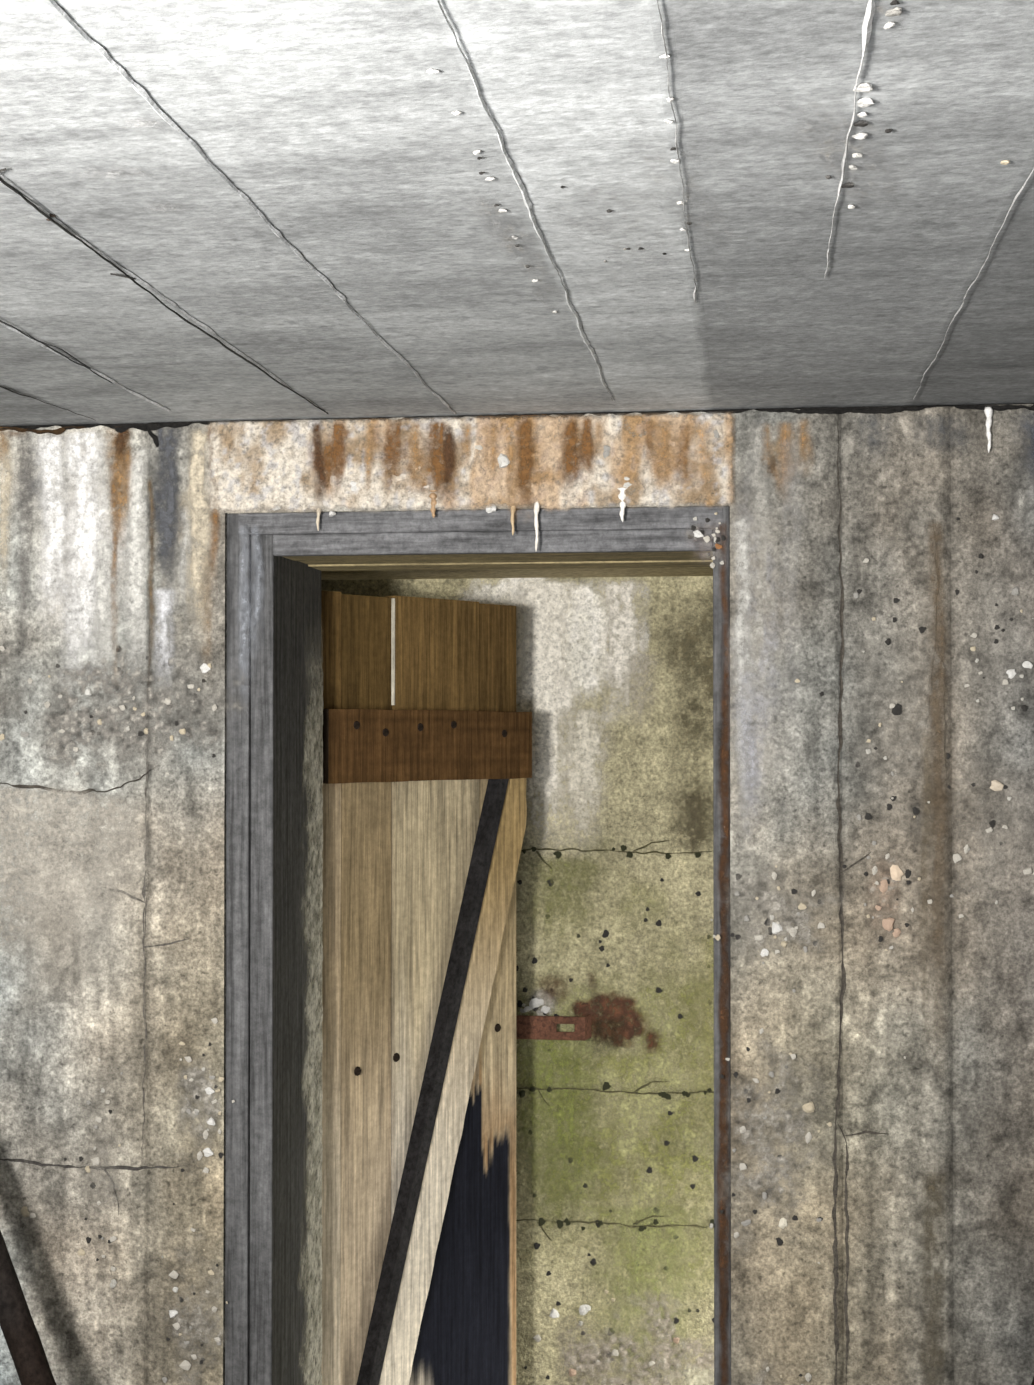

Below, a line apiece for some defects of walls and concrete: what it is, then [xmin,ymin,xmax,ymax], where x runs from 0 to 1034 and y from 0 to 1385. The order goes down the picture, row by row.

crack [0,168,1034,447]
corrosion [111,431,130,568]
corrosion [313,424,347,495]
corrosion [366,422,470,490]
corrosion [563,419,599,482]
leakage [461,578,652,830]
leakage [670,595,713,767]
crack [0,717,188,1215]
corrosion [546,975,658,1049]
crack [521,840,712,869]
crack [832,424,886,1385]
crack [516,1081,714,1106]